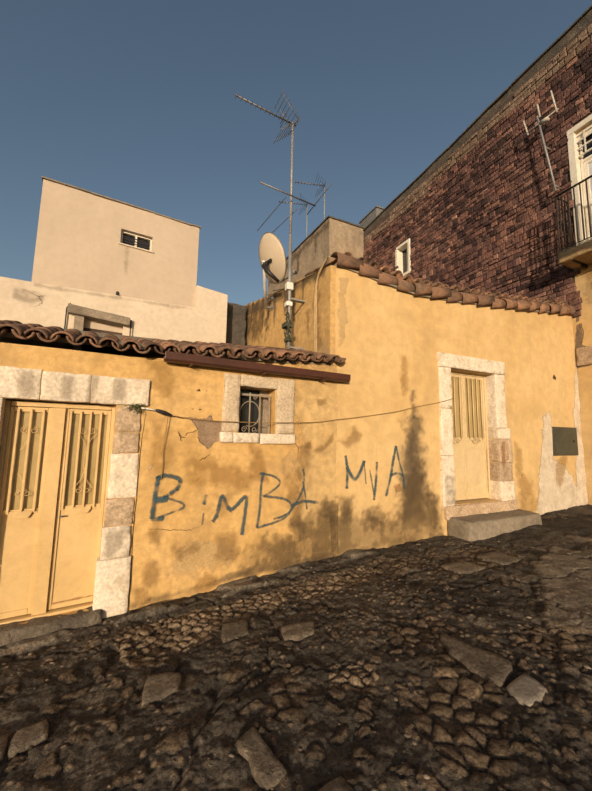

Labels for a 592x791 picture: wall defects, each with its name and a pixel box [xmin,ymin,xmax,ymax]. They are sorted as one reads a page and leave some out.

spalling [575,316,586,349]
crack [128,414,146,605]
spalling [185,409,224,449]
damp [223,417,442,580]
peeling [535,364,590,515]